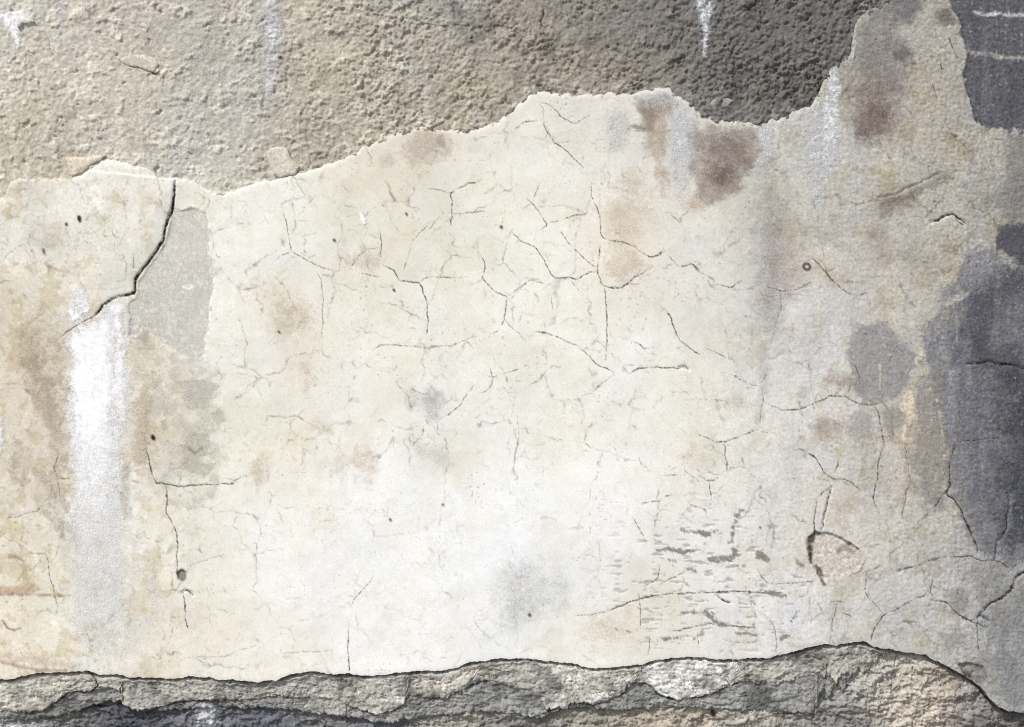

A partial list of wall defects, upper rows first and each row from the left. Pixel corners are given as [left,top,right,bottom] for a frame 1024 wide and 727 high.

peeling [0,0,889,198]
peeling [950,0,1024,134]
crack [62,185,188,336]
peeling [128,206,213,401]
crack [482,185,742,387]
damp [62,287,131,631]
spalling [0,641,1024,727]
crack [592,569,812,651]
crack [695,367,884,528]
spalling [807,531,866,585]
crack [864,437,1024,649]
damp [910,135,1024,706]